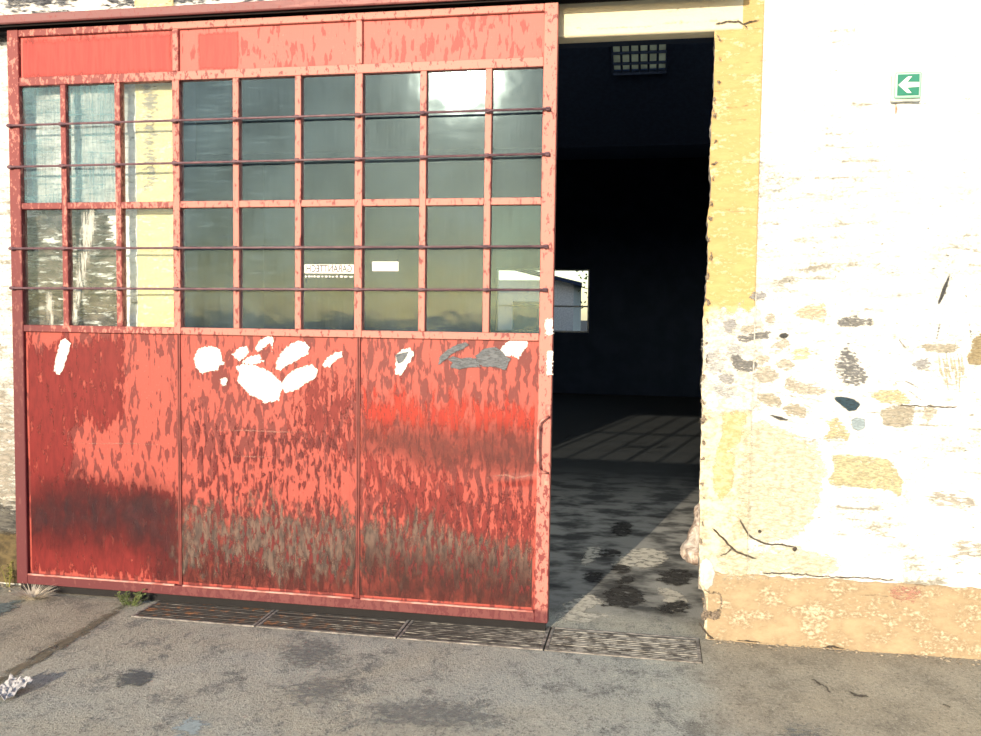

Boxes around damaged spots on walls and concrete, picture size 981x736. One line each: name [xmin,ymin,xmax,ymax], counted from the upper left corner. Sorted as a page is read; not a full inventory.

damp [2,0,77,15]
damp [102,0,135,9]
peeling [28,332,535,605]
flaking render [699,303,841,579]
crack [713,521,895,581]